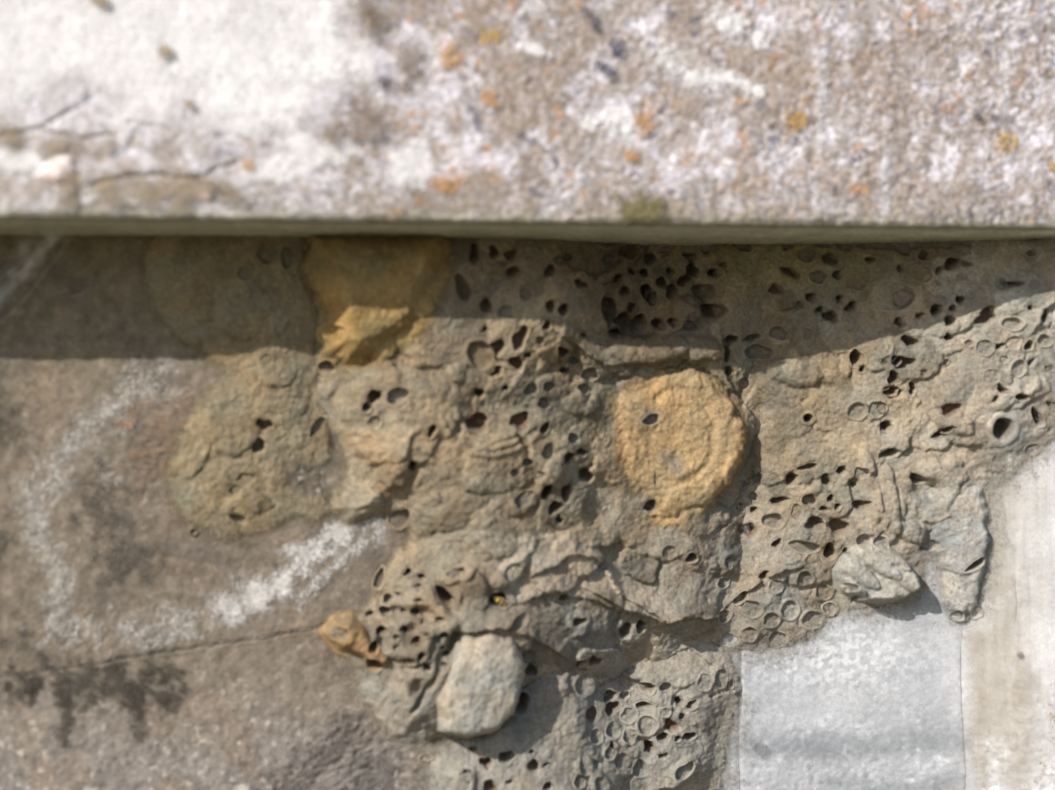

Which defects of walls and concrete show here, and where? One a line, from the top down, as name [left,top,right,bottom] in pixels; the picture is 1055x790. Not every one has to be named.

crack [1,107,171,146]
crack [113,162,235,196]
leakage [0,353,385,747]
crack [0,625,322,678]